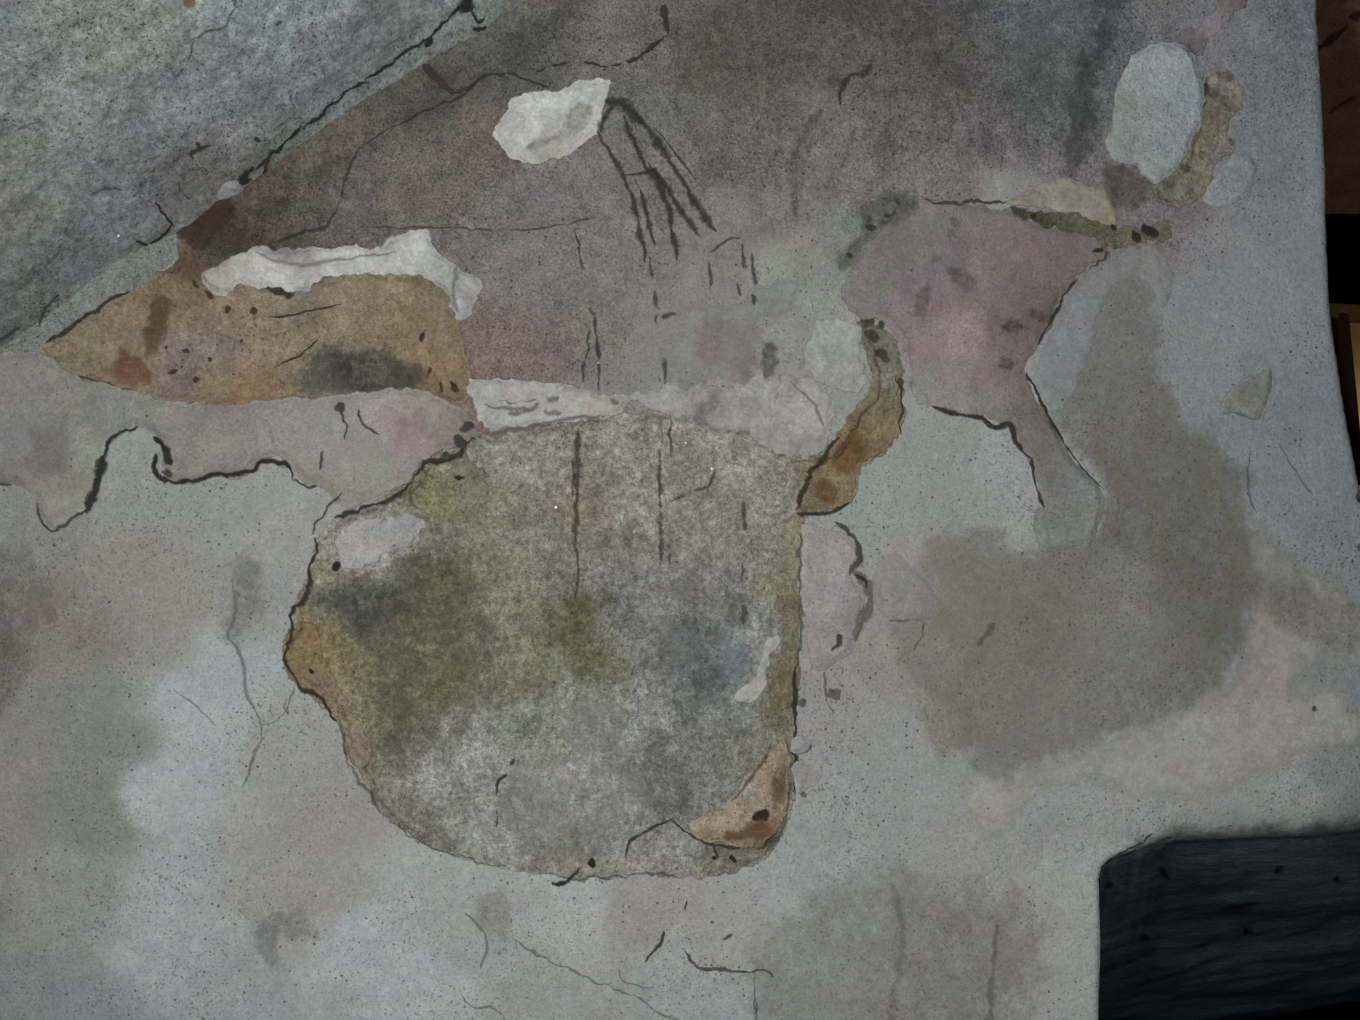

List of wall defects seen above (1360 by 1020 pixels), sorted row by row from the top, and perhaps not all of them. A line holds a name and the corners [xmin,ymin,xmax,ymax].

crack [176,0,237,77]
peeling [1175,0,1247,56]
crack [239,0,669,241]
crack [90,142,211,246]
crack [0,293,60,341]
spalling [0,67,1245,882]
water stain [898,245,1360,835]
crack [460,901,774,1020]